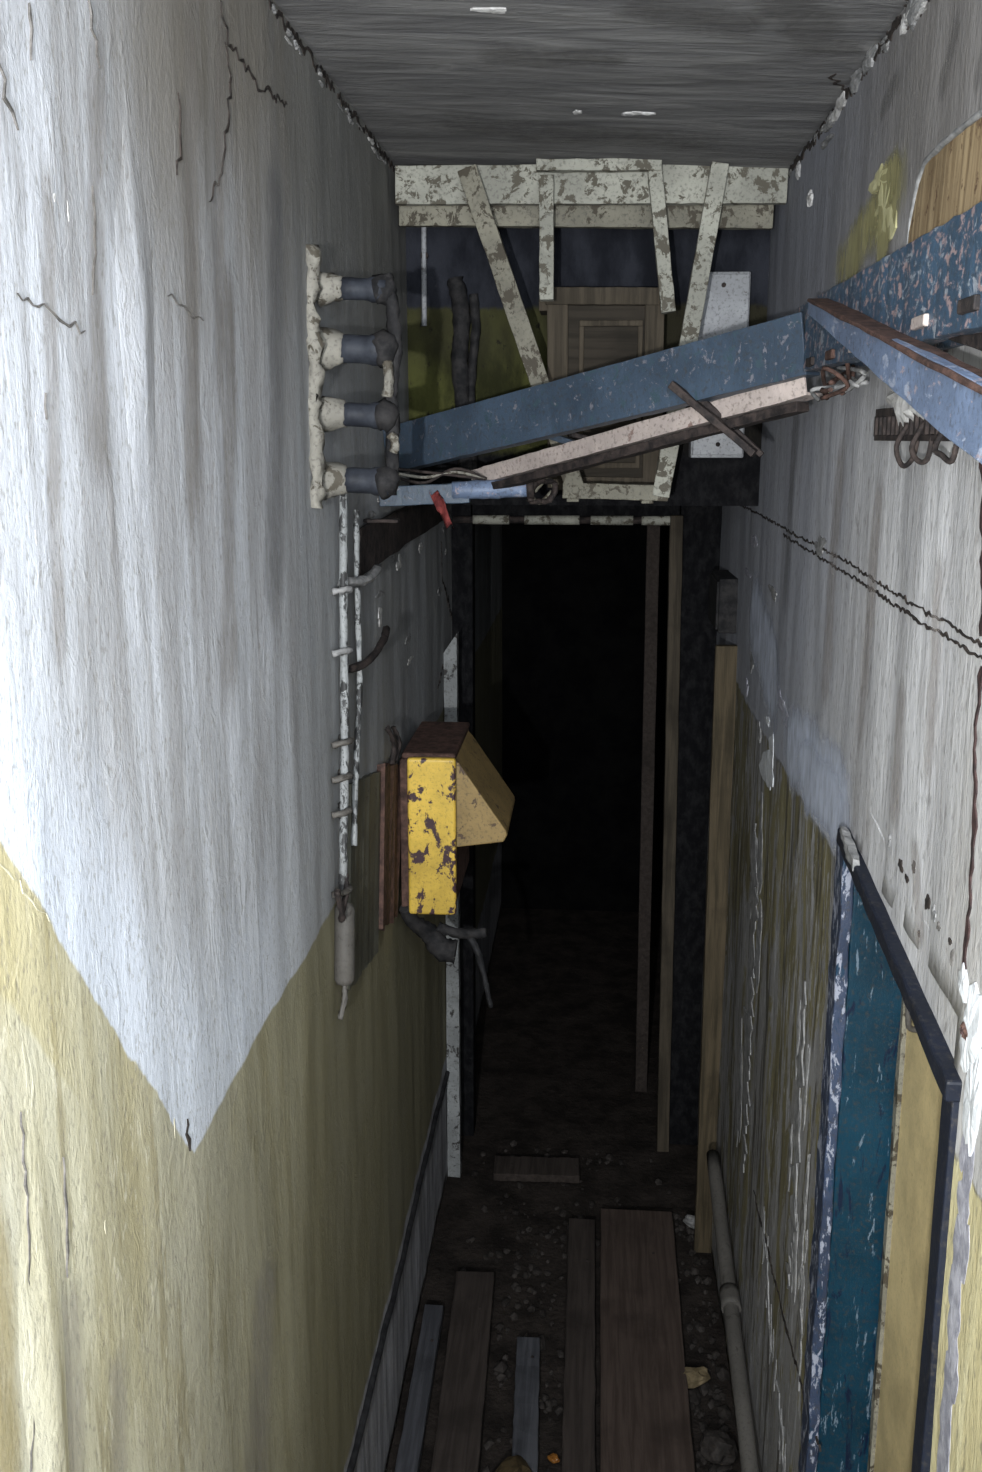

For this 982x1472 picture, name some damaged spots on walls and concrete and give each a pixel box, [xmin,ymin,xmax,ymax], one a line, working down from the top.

crack [0,3,34,130]
crack [175,93,183,175]
crack [209,0,288,202]
flaking render [788,161,813,207]
flaking render [813,0,928,149]
peeling [868,163,897,242]
crack [17,293,86,334]
crack [741,462,982,970]
flaking render [888,834,916,883]
crack [20,1112,70,1286]
peeling [917,894,982,1472]
crack [28,1420,36,1472]